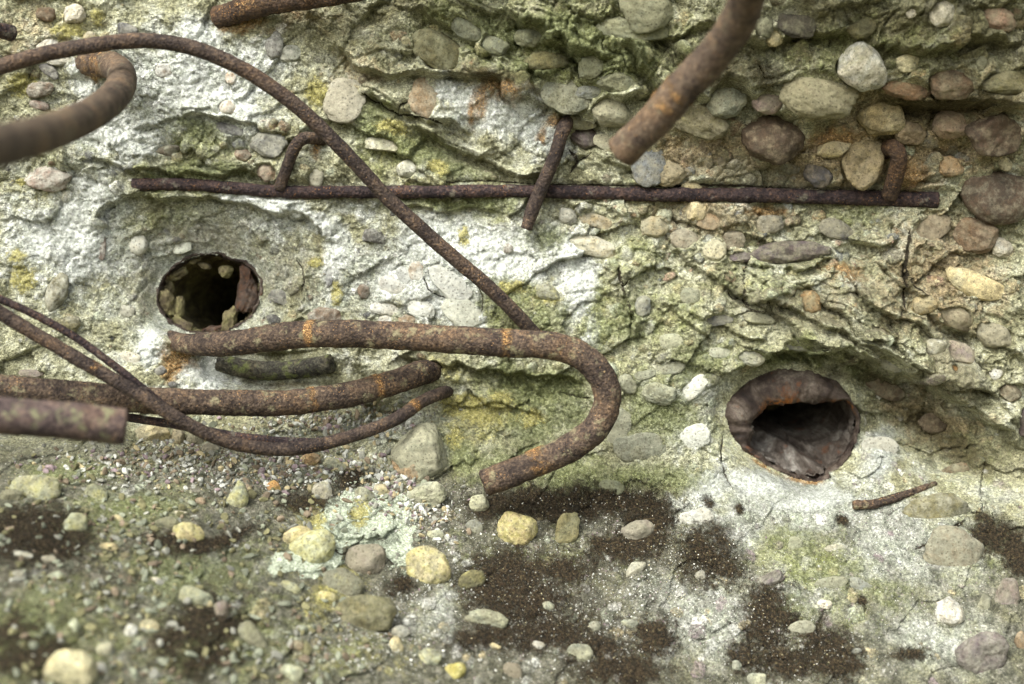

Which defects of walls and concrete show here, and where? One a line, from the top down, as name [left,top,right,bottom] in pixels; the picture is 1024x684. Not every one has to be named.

crack [896,229,926,320]
rust [302,319,316,346]
rust [162,350,190,382]
peeling [443,391,545,428]
rust [791,469,822,484]